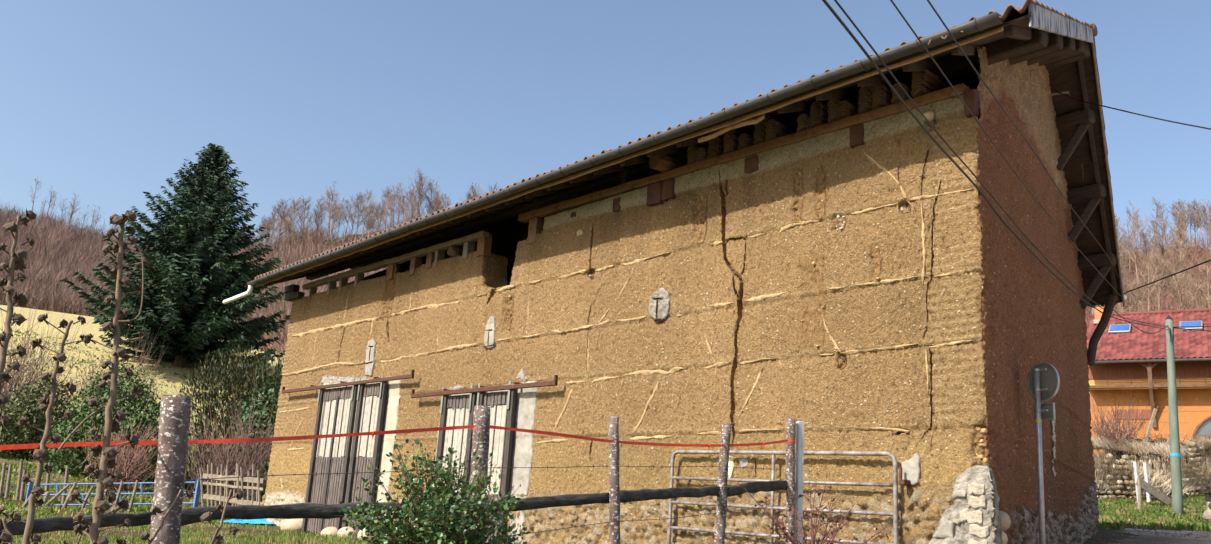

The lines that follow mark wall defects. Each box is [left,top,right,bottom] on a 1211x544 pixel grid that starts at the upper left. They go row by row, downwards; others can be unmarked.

crack [718,169,757,475]
crack [893,145,942,451]